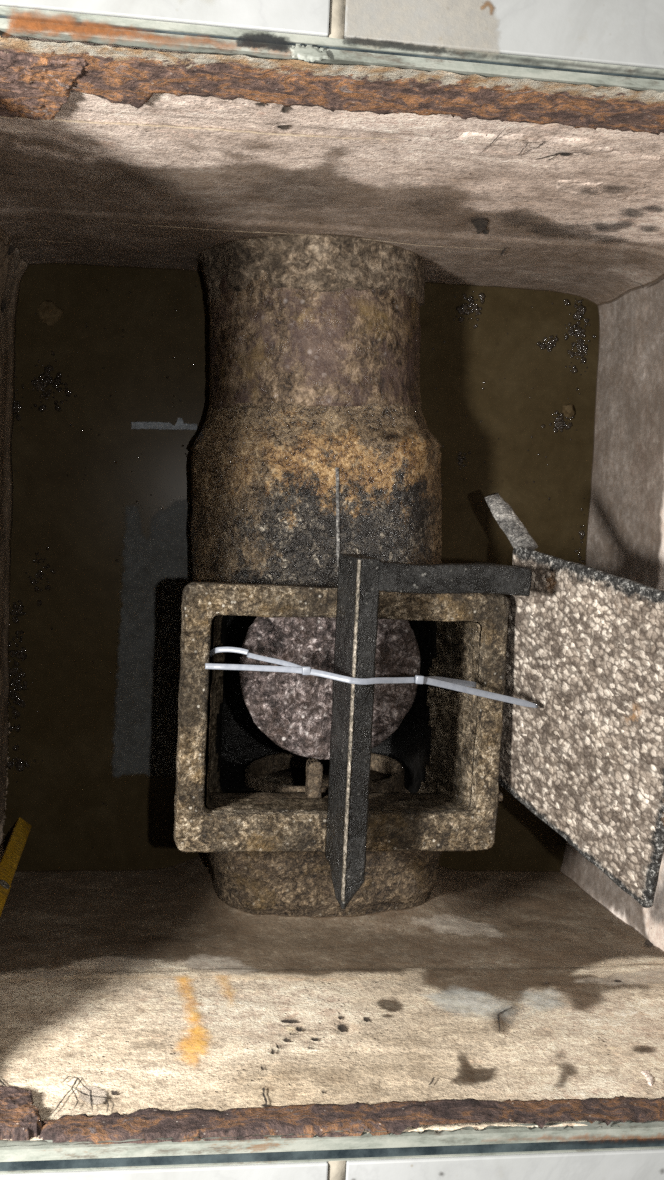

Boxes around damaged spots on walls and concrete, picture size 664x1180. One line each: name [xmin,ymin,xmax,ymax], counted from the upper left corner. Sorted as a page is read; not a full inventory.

water stain [0,141,664,821]
water stain [0,841,664,1026]
water stain [452,1053,494,1084]
water stain [559,1065,575,1087]